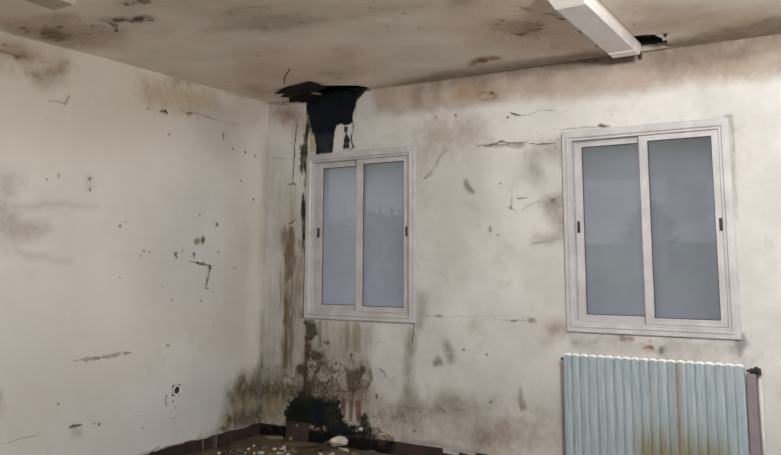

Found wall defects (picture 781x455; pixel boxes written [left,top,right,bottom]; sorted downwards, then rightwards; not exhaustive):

crack [191,253,211,289]
leakage [221,21,781,439]